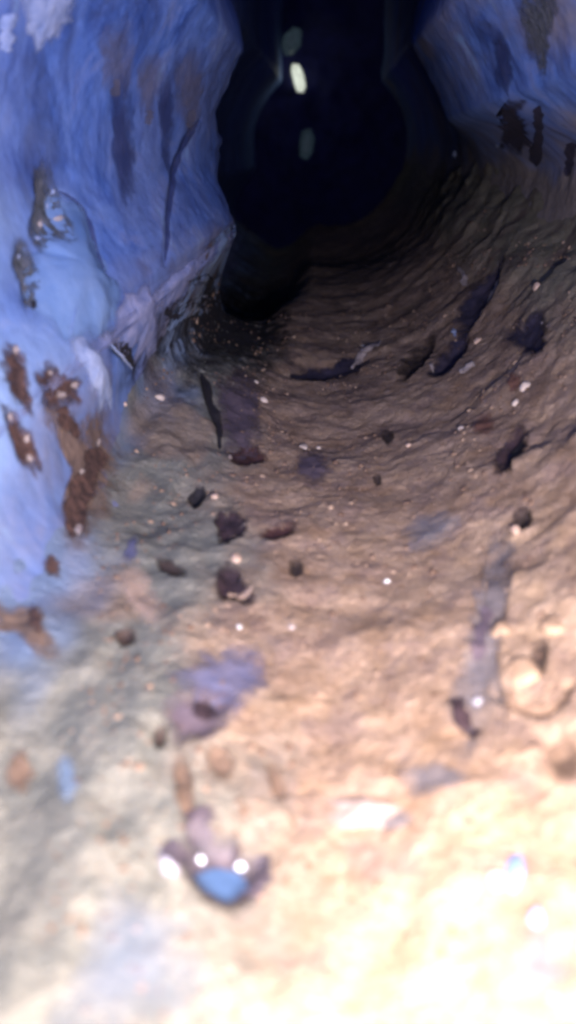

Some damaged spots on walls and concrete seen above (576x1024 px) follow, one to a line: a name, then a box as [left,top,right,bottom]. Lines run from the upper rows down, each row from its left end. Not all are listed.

spalling [495,101,533,152]
corrosion [1,345,114,543]